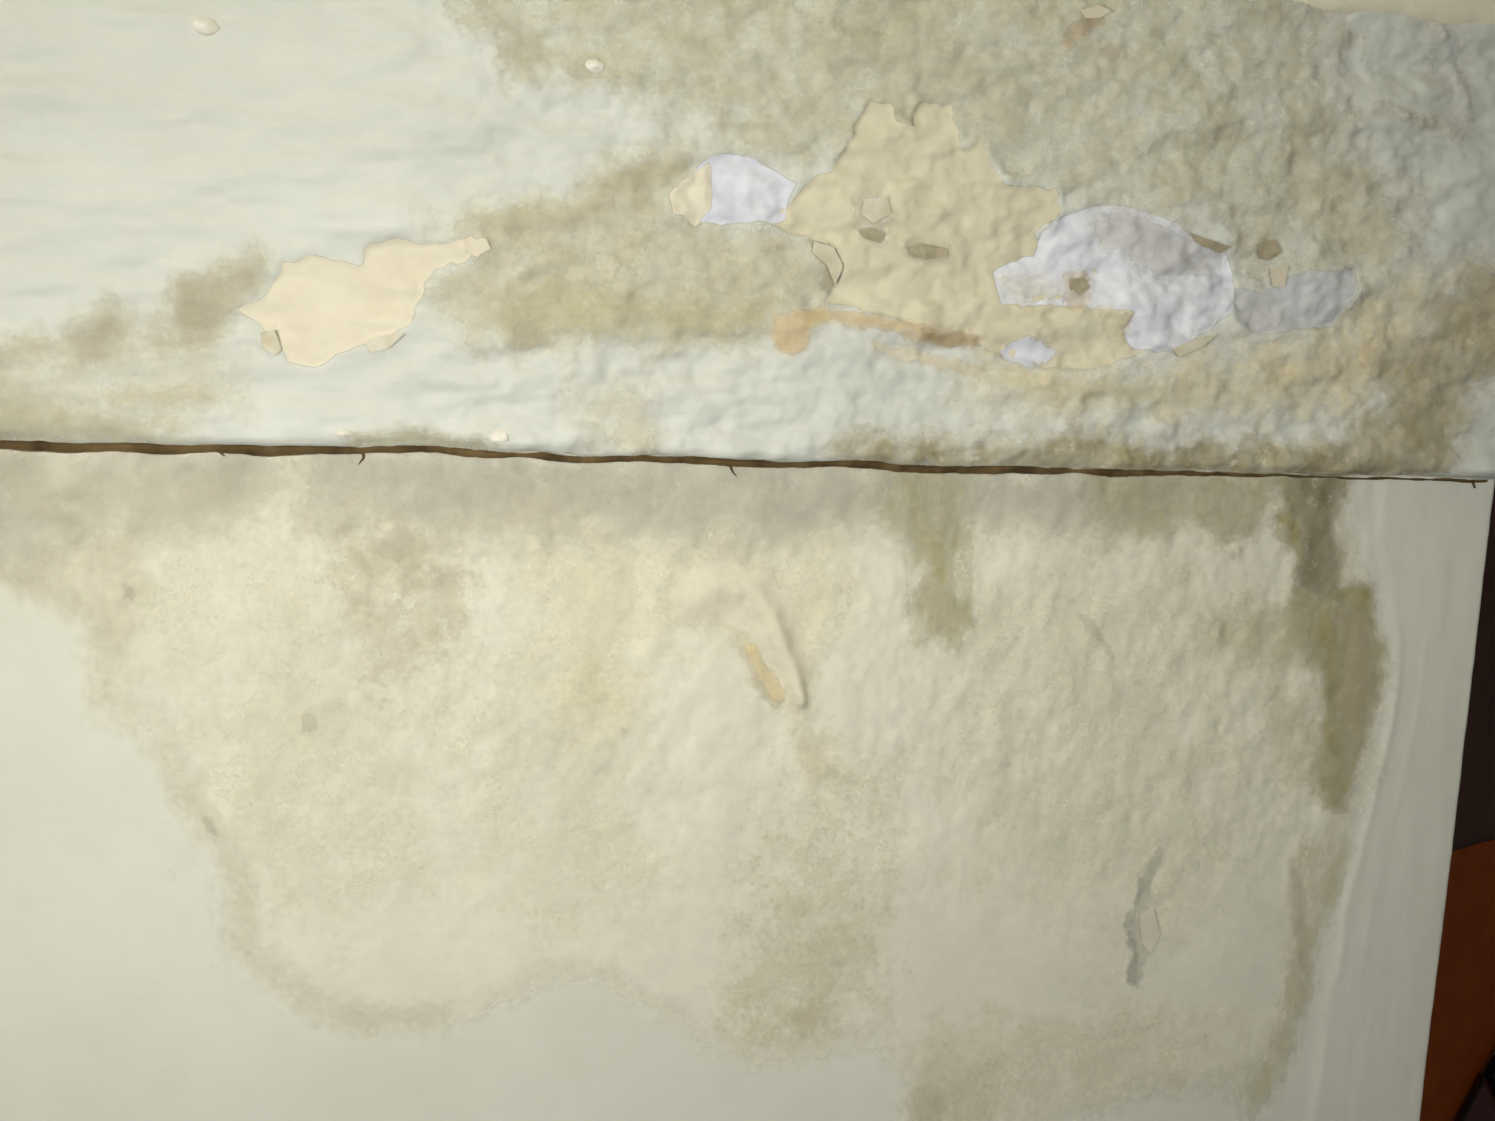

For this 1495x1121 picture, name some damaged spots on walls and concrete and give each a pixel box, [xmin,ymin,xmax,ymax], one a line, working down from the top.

peeling [238,236,490,367]
water stain [427,150,827,355]
peeling [669,101,1358,369]
crack [0,440,1488,488]
water stain [0,257,1495,1121]